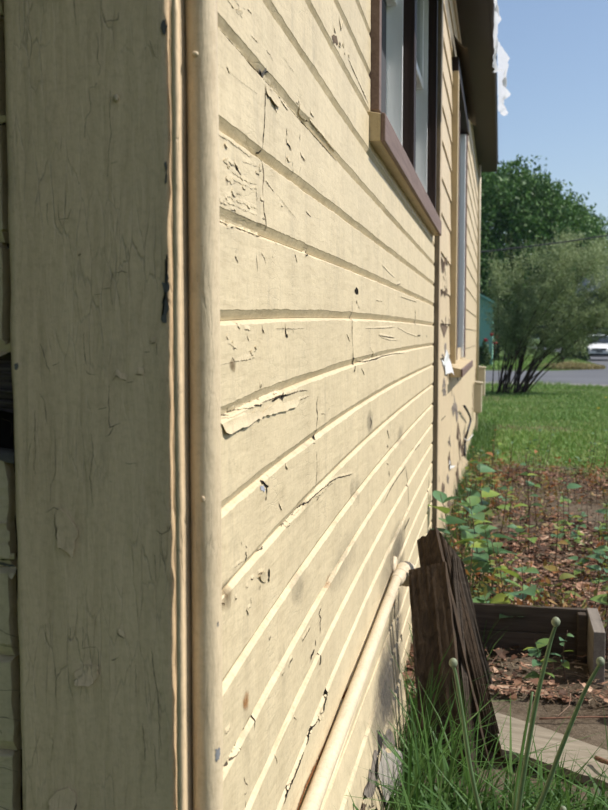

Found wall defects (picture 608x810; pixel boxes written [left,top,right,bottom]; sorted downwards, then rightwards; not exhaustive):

peeling [218,27,335,151]
peeling [332,19,369,104]
peeling [219,132,265,237]
spalling [0,343,18,464]
peeling [221,379,309,435]
leakage [375,640,400,736]
crack [224,711,255,766]
crack [284,752,304,804]